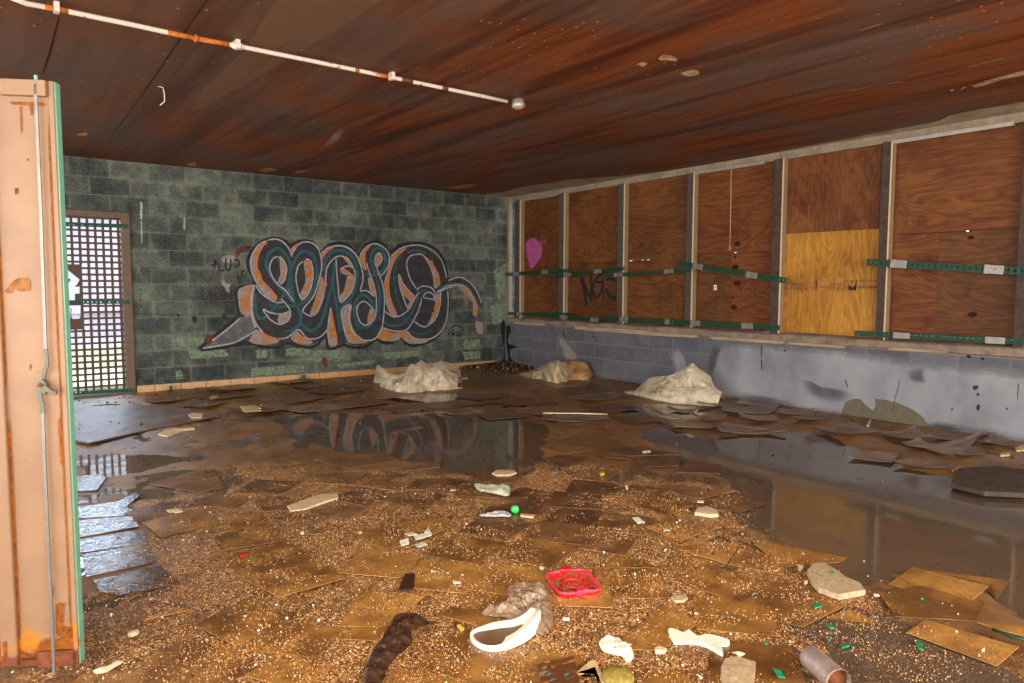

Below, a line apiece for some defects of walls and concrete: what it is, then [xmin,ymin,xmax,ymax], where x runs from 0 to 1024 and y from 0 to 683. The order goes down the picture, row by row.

rust [45,4,69,14]
rust [168,30,230,47]
peeling [636,54,700,77]
peeling [950,71,1024,91]